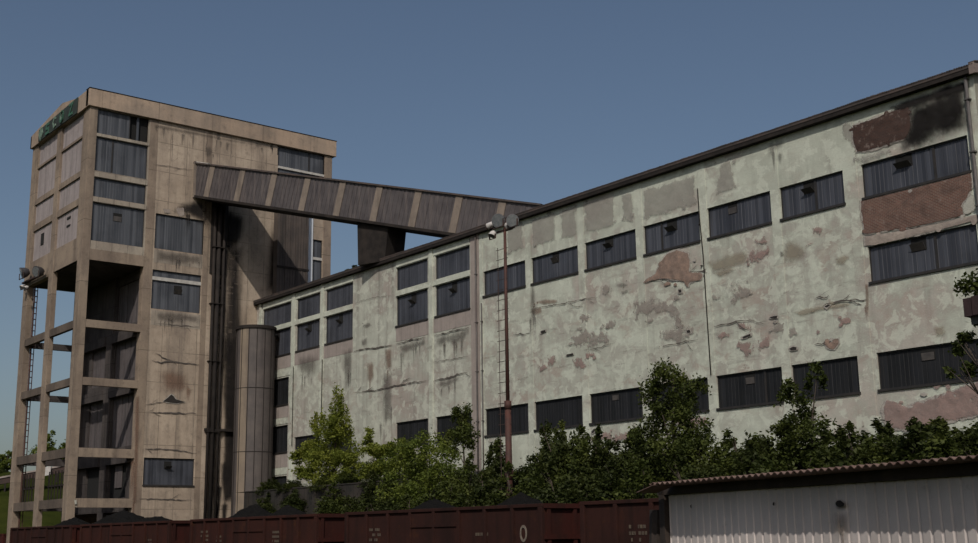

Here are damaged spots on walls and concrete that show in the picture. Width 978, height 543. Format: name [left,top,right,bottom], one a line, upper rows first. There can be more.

flaking render [843,107,912,162]
leakage [893,82,965,145]
flaking render [859,172,978,245]
peeling [539,314,616,371]
flaking render [633,248,704,347]
crack [714,320,766,331]
crack [816,290,866,305]
flaking render [880,381,978,432]